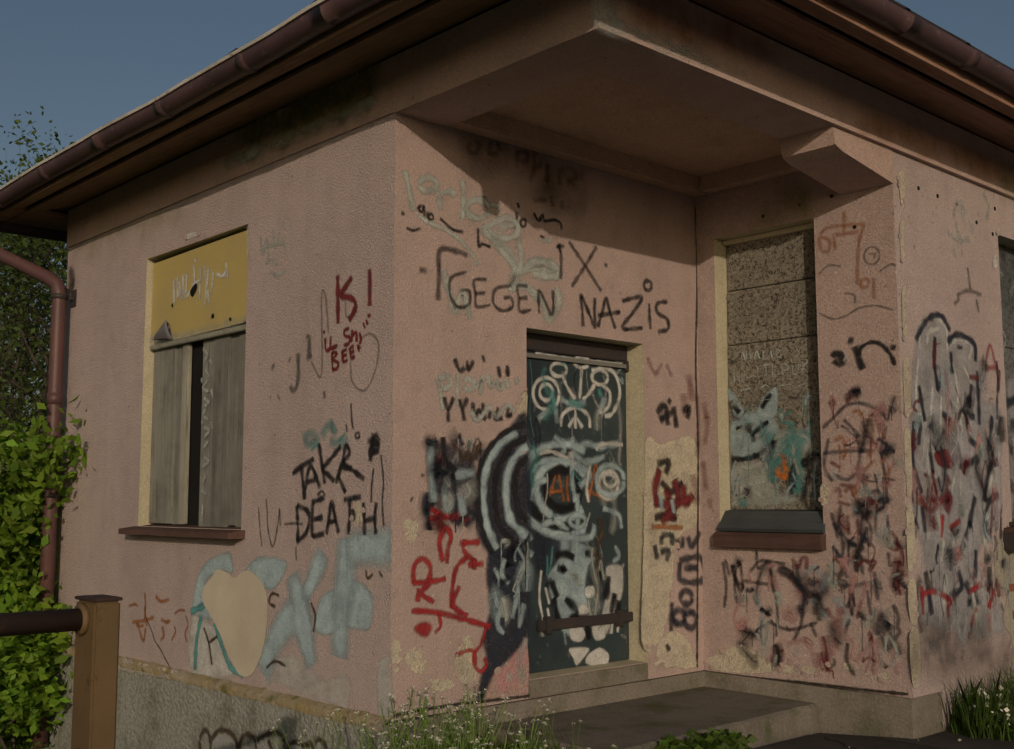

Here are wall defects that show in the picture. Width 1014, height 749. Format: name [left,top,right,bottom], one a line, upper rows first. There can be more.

flaking render [994,537,1014,680]